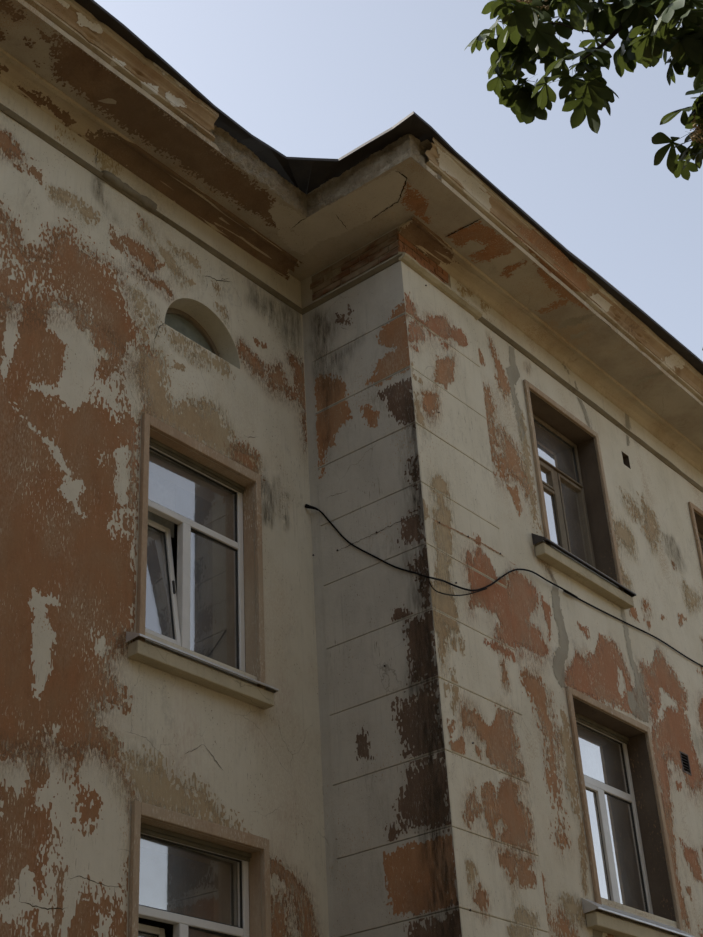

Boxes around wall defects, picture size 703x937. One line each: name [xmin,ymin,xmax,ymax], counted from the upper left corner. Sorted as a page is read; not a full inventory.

peeling [76,12,103,34]
peeling [17,28,302,280]
crack [372,172,407,219]
peeling [235,291,537,517]
peeling [656,351,687,372]
peeling [0,130,266,937]
peeling [609,486,663,590]
peeling [629,599,651,629]
peeling [355,727,374,761]
peeling [383,454,588,937]
peeling [565,621,703,937]
peeling [270,856,319,937]